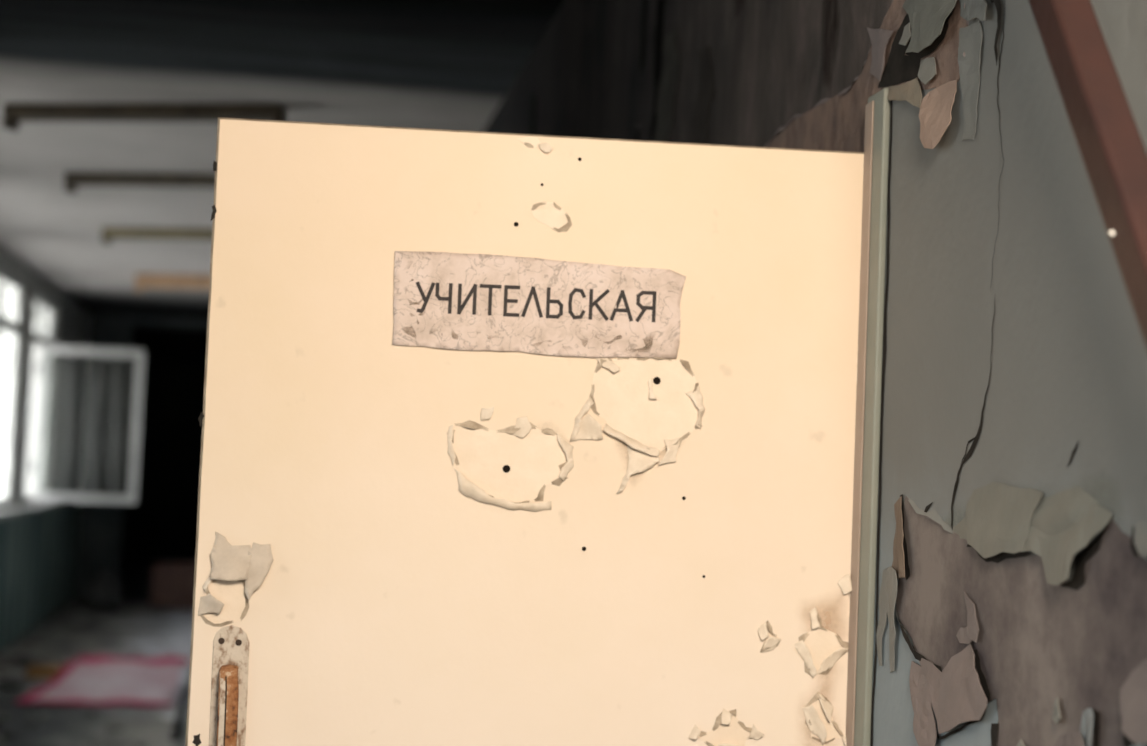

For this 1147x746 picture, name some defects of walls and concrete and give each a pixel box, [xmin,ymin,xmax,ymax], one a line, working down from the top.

peeling [765,0,1002,152]
peeling [531,202,572,232]
crack [924,2,1005,531]
peeling [447,357,705,512]
peeling [198,532,273,627]
peeling [758,620,781,652]
peeling [793,606,849,678]
peeling [838,573,852,617]
peeling [876,481,1147,746]
peeling [689,708,764,746]
peeling [802,692,847,746]